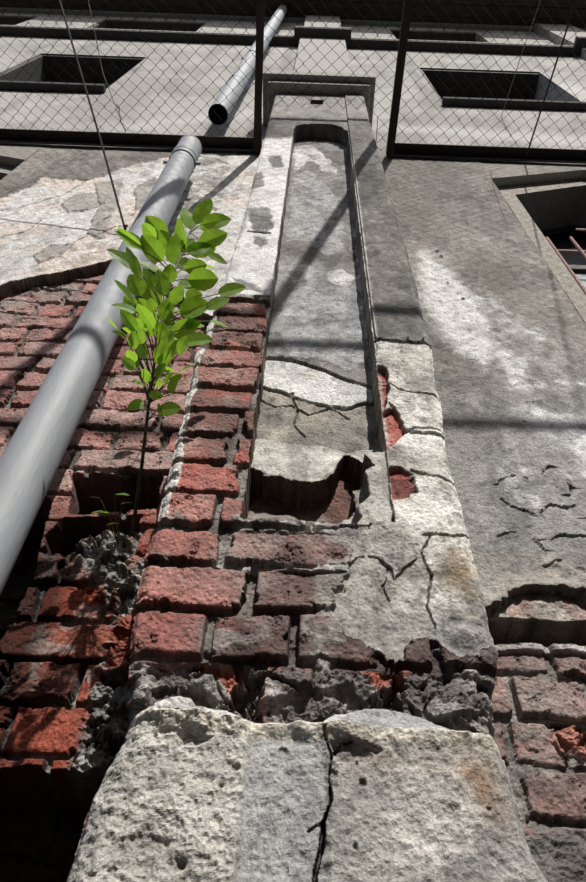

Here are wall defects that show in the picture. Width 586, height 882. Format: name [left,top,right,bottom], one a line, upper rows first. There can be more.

flaking render [0,155,171,458]
crack [261,391,350,438]
flaking render [130,147,586,882]
crack [495,464,586,568]
crack [348,532,469,630]
crack [307,722,335,882]
spalling [107,832,187,882]